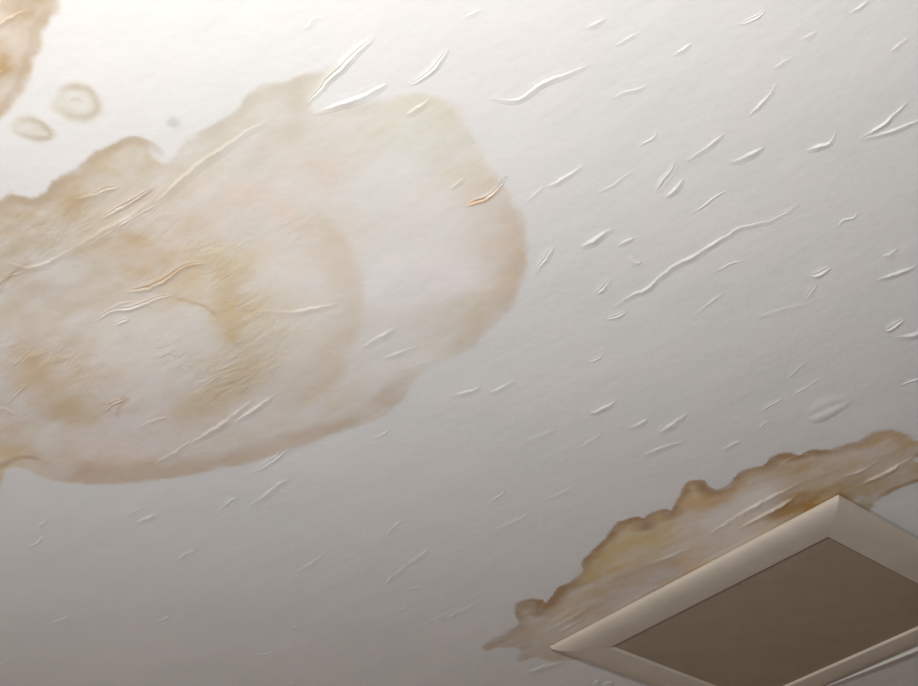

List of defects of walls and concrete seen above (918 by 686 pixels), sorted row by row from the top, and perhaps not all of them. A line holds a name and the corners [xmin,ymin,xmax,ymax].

water stain [0,0,110,146]
water stain [0,59,534,492]
water stain [477,427,918,664]